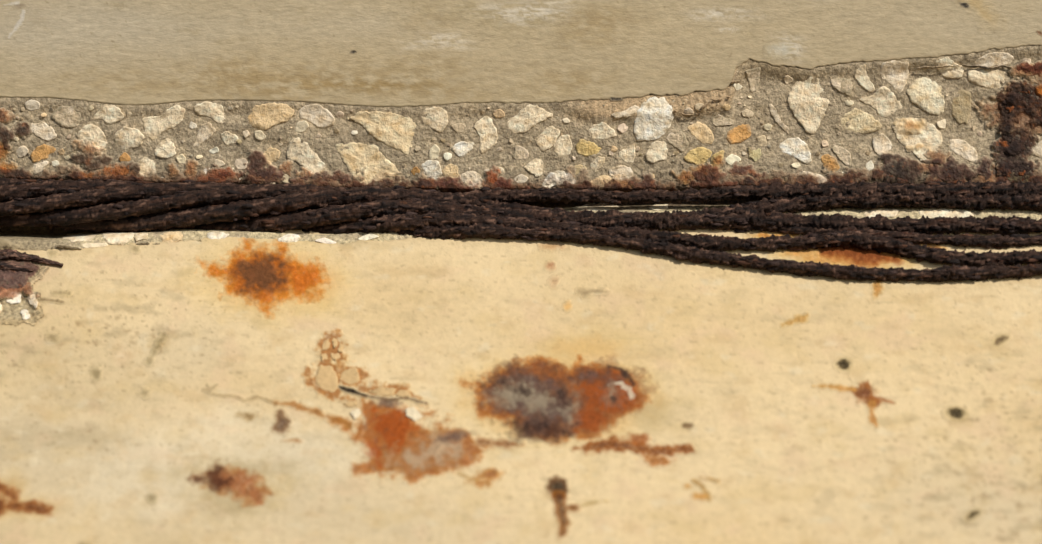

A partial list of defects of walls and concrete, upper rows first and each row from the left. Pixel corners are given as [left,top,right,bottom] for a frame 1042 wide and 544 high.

spalling [0,45,1042,213]
rust [0,60,1042,206]
spalling [783,205,1042,220]
spalling [0,226,415,326]
rust [743,230,951,300]
rust [166,229,698,543]
rust [810,379,897,429]
rust [0,471,73,525]